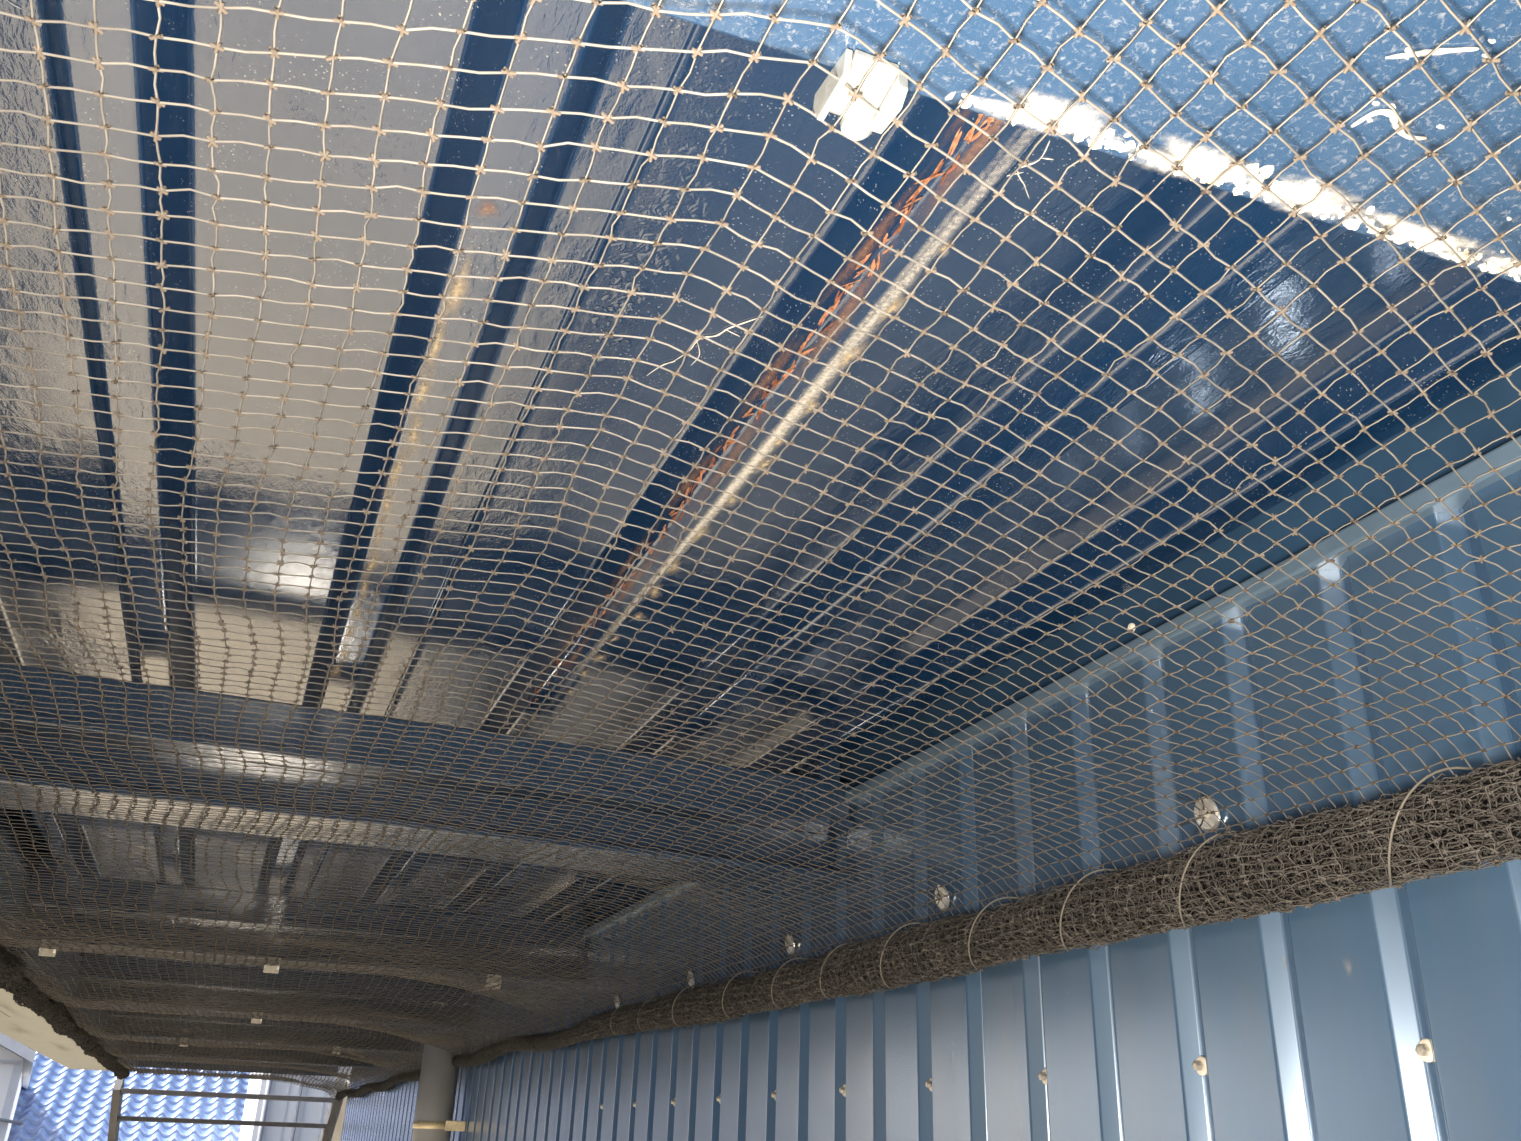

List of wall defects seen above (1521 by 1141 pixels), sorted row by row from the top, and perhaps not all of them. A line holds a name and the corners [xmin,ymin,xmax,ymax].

corrosion [529,113,1000,707]
peeling [945,92,1521,282]